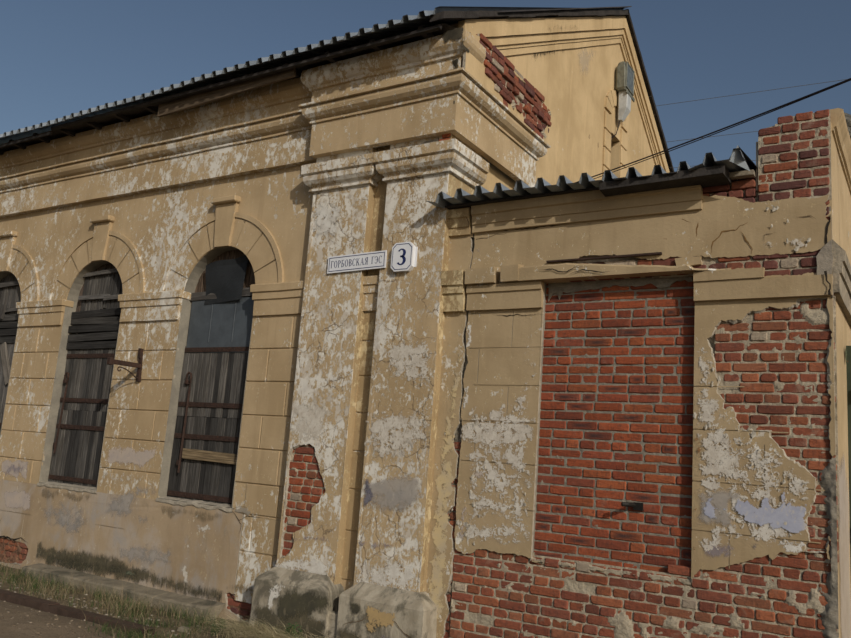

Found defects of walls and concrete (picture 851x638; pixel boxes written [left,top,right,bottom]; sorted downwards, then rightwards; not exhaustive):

flaking render [476,33,552,139]
flaking render [702,109,832,211]
crack [682,219,777,255]
peeling [388,341,432,386]
flaking render [0,537,28,565]
flaking render [275,444,331,578]
peeling [356,558,417,590]
peeling [364,409,430,458]
crack [443,302,468,638]
flaking render [427,296,839,638]